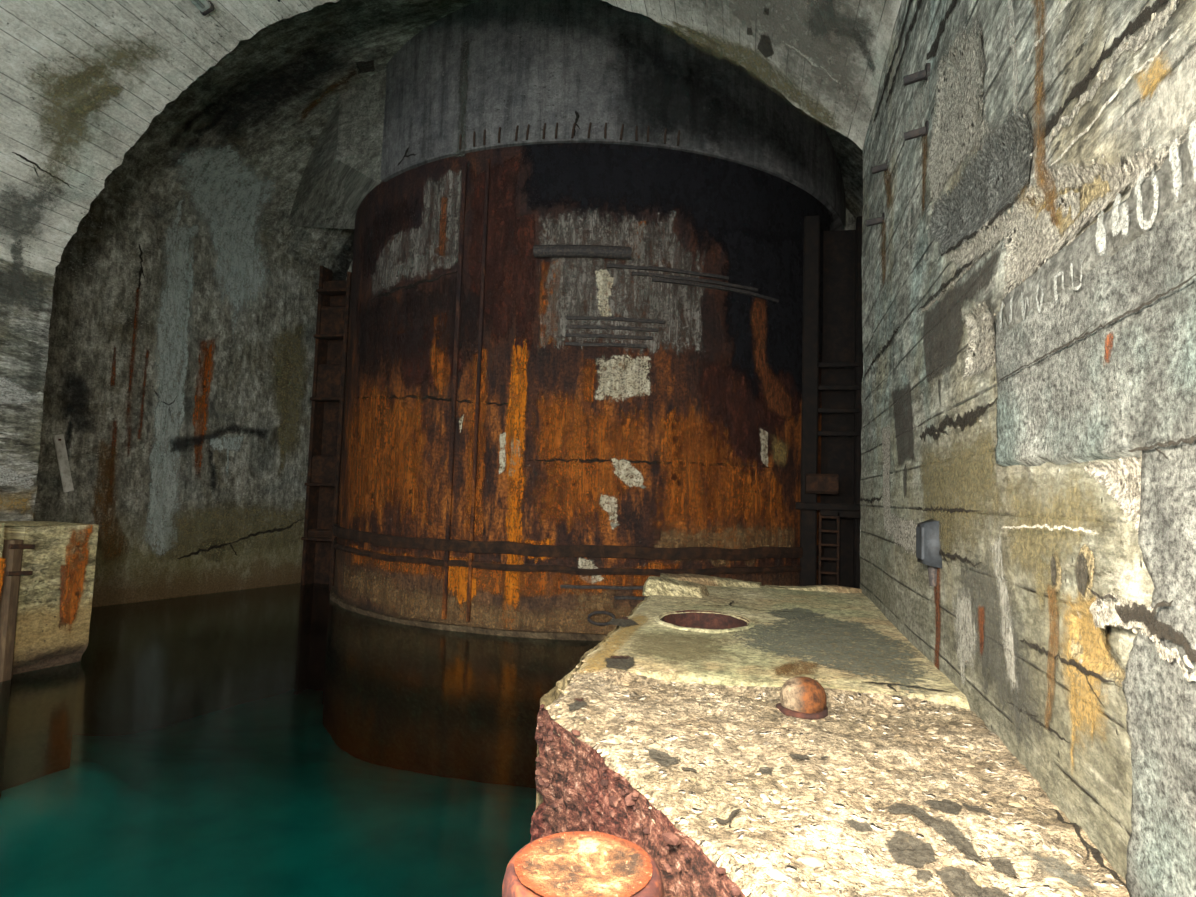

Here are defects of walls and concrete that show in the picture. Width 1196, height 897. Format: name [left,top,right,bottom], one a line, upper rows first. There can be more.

leakage [56,66,122,125]
corrosion [1034,0,1060,226]
peeling [371,170,466,294]
peeling [459,122,833,403]
crack [863,0,1179,378]
peeling [0,377,40,405]
corrosion [59,287,149,631]
corrosion [192,340,215,473]
peeling [499,432,520,476]
corrosion [347,339,678,630]
corrosion [657,407,785,527]
corrosion [751,298,792,418]